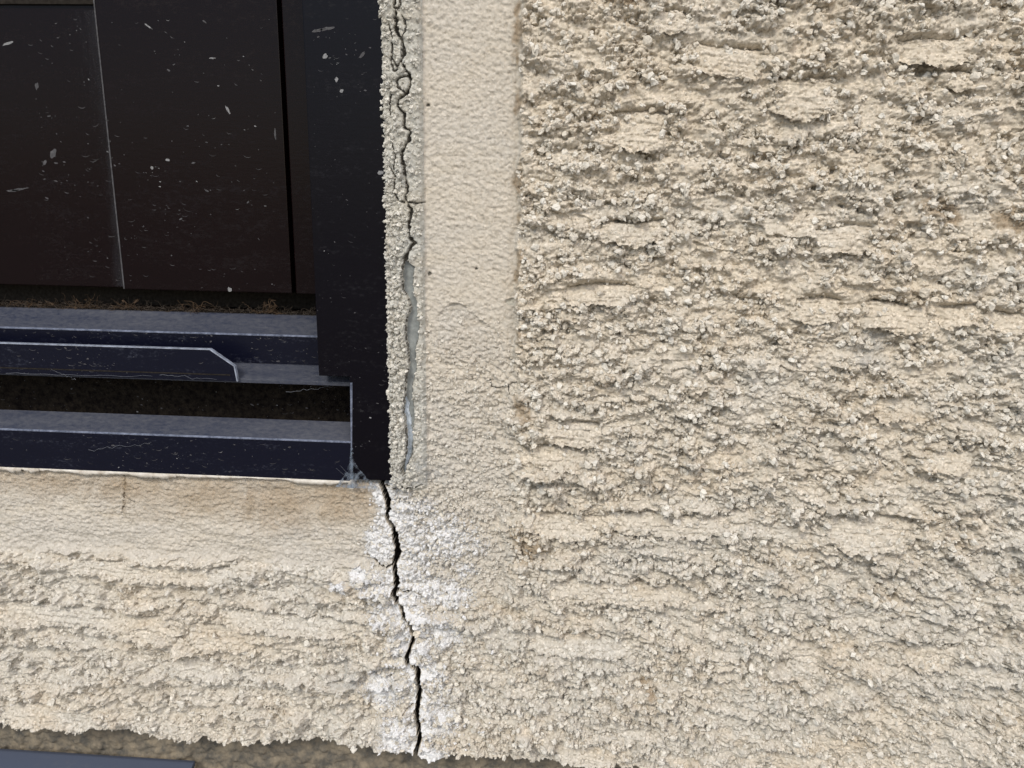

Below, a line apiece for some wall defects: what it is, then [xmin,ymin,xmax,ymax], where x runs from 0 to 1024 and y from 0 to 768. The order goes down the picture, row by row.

crack [367,0,425,754]